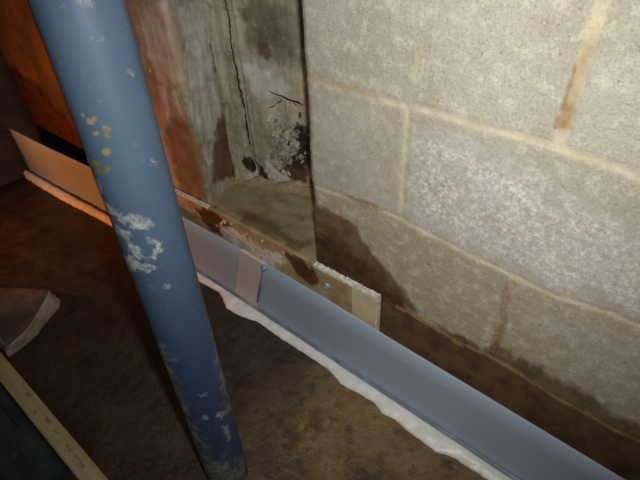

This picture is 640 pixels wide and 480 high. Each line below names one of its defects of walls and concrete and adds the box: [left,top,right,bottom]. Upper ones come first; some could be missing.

leakage [174,0,235,183]
crack [224,0,252,146]
crack [268,90,305,108]
leakage [279,166,306,182]
leakage [407,127,640,312]
leakage [285,207,640,480]